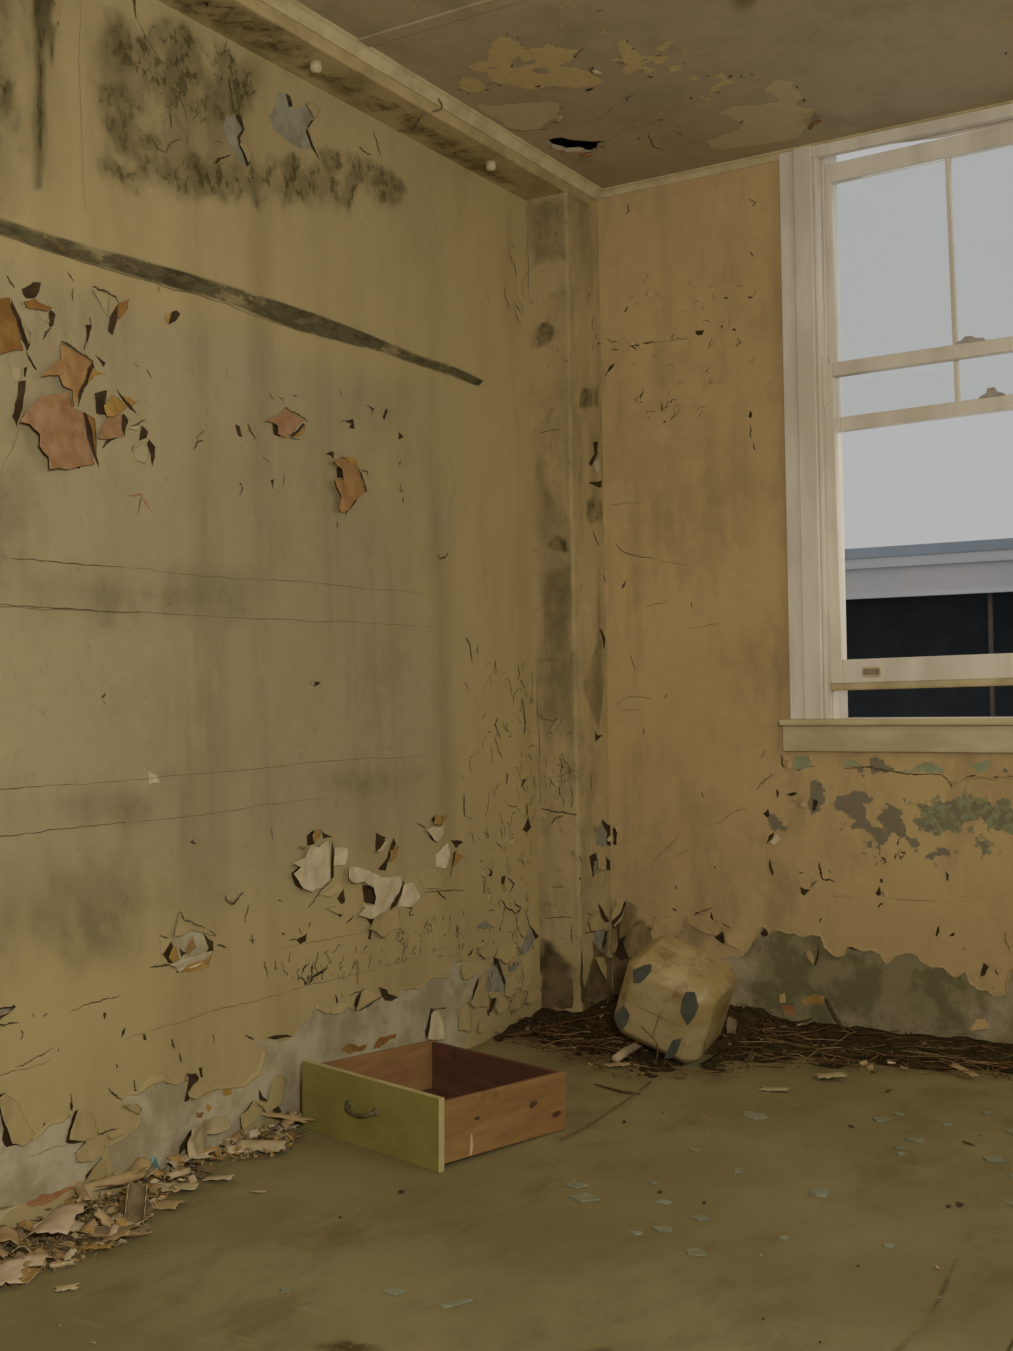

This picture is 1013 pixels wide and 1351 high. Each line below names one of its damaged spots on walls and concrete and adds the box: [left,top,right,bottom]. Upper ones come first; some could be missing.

damp [34,0,56,150]
damp [114,26,202,112]
peeling [447,33,822,149]
damp [117,154,361,205]
peeling [0,276,155,470]
damp [0,221,483,385]
peeling [327,451,368,529]
peeling [291,815,465,940]
peeling [579,819,618,897]
peeling [776,755,1013,908]
spalling [580,896,1013,1046]
spalling [0,899,542,1239]